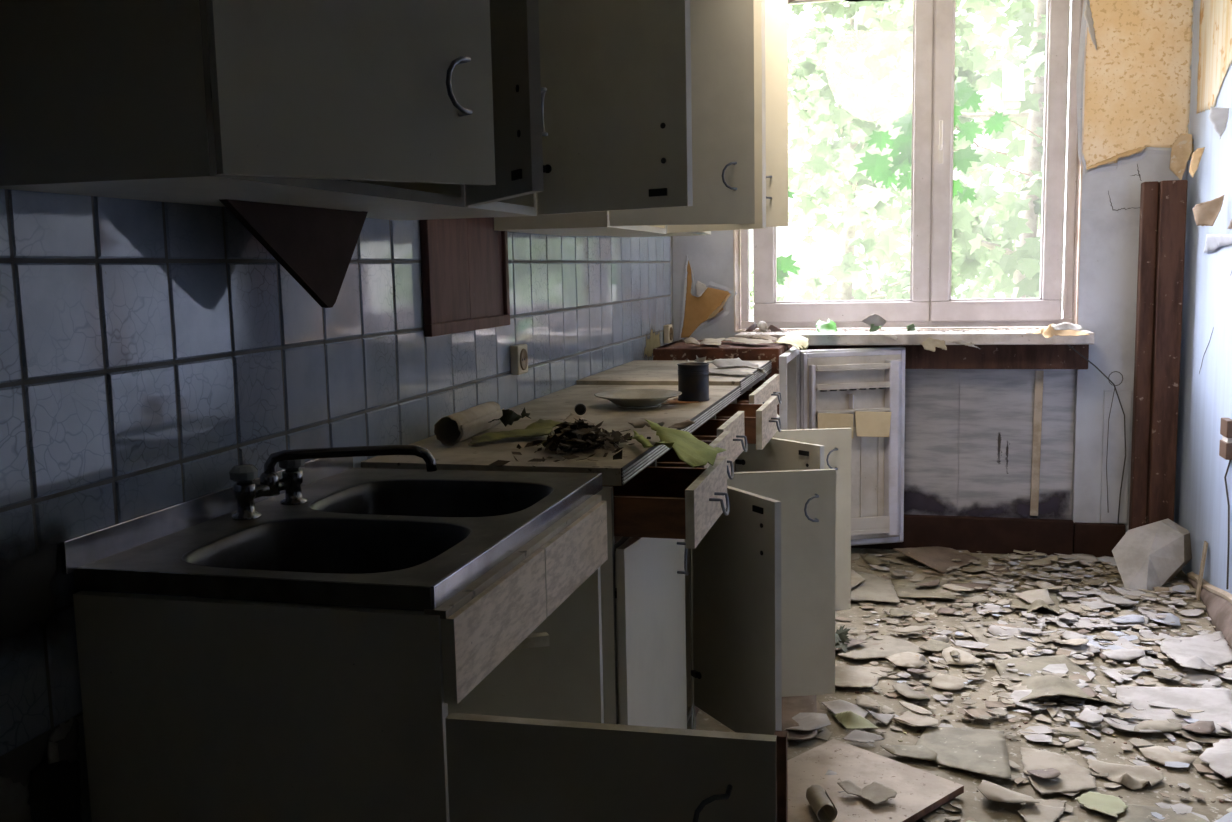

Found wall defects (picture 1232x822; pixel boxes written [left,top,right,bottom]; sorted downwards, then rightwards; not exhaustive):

peeling [1076,0,1195,177]
peeling [678,254,737,341]